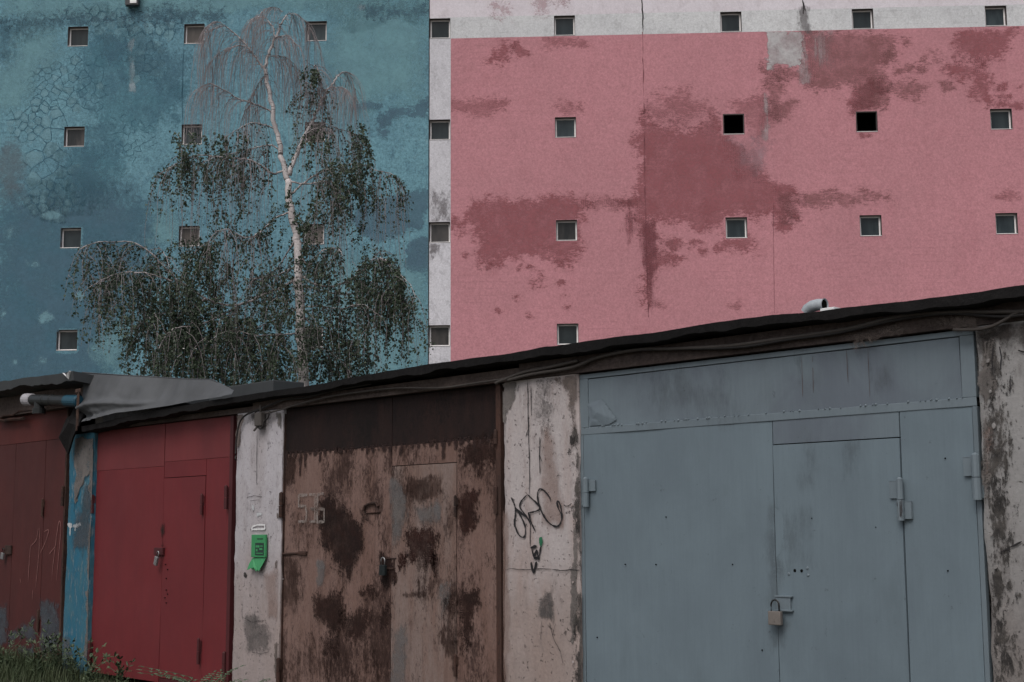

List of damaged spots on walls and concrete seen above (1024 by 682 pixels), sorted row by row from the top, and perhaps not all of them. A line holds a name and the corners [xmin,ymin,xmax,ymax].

crack [6,4,184,190]
crack [639,0,647,217]
peeling [758,26,1022,123]
leakage [626,211,657,306]
spalling [72,436,93,659]
rust [285,453,297,484]
rust [283,493,482,682]
rust [404,428,505,537]
spalling [976,325,1023,682]